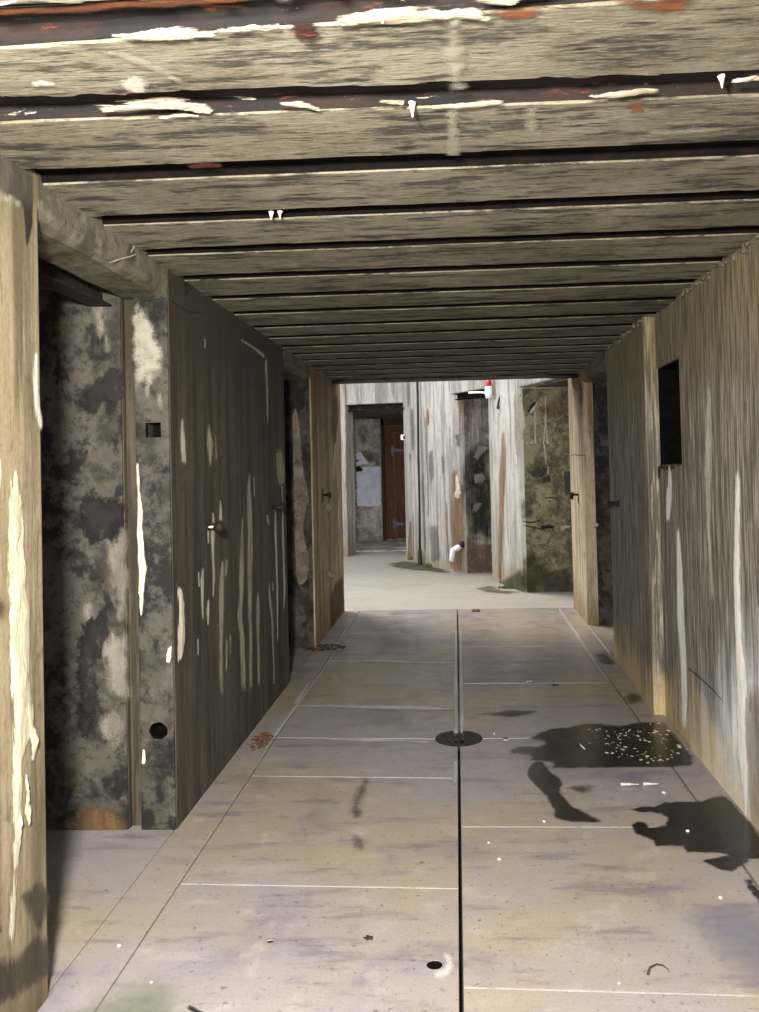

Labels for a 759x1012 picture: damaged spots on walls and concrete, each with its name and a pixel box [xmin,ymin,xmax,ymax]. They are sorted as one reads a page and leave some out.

rust [0,0,243,14]
rust [290,21,321,40]
rust [494,7,540,19]
rust [617,0,690,11]
water stain [23,202,32,243]
water stain [33,353,42,428]
water stain [75,368,125,414]
water stain [77,463,146,738]
water stain [0,460,49,942]
water stain [703,856,748,871]
water stain [0,939,49,1002]